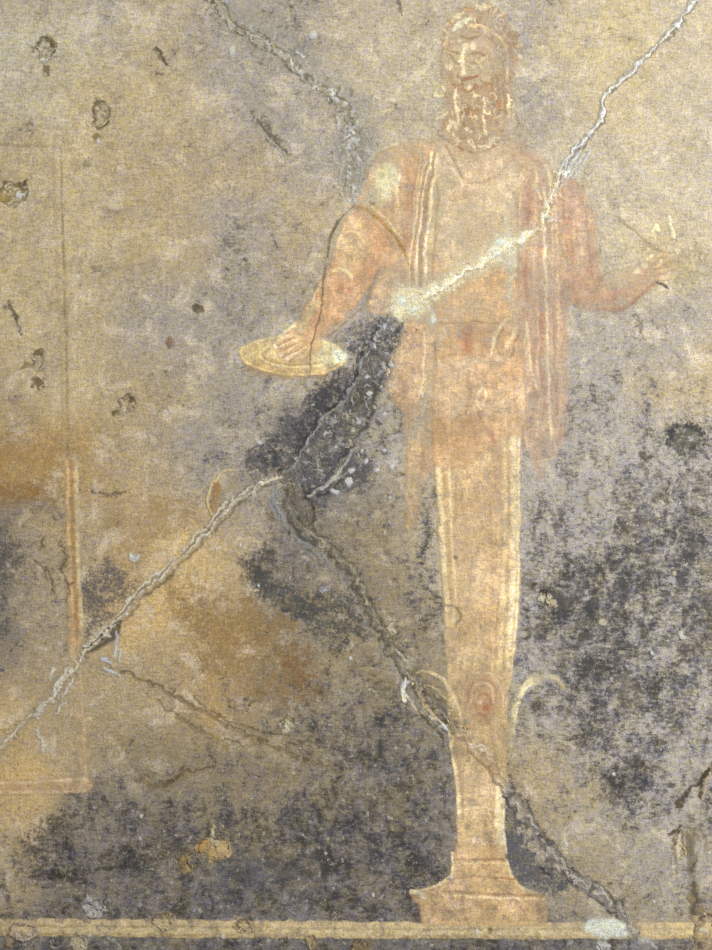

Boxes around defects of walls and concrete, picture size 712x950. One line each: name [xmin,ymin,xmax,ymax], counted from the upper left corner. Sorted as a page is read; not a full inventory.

spalling [36,36,59,75]
spalling [0,179,30,206]
crack [190,0,378,306]
crack [390,0,699,323]
spalling [278,312,417,497]
leakage [666,423,706,454]
leakage [78,561,135,636]
leakage [239,543,374,657]
crack [0,469,657,950]
crack [682,764,712,800]
leakage [504,798,568,895]
spalling [668,798,712,950]